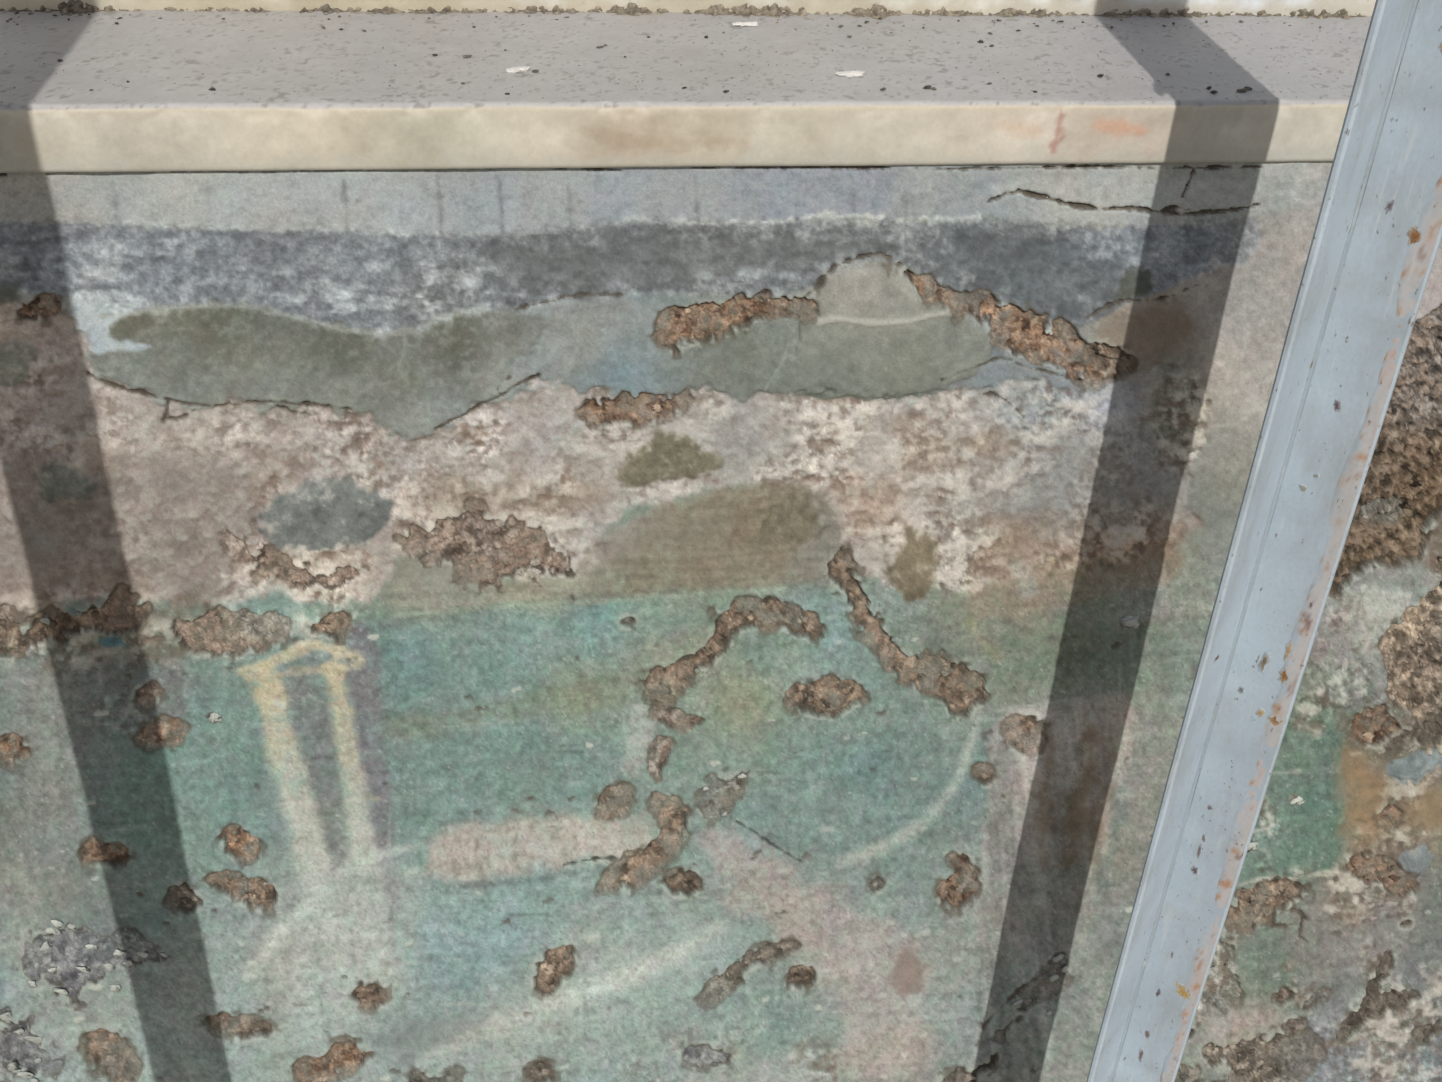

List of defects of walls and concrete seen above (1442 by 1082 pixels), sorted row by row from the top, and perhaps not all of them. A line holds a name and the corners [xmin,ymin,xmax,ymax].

crack [45,169,82,177]
crack [153,167,445,175]
crack [487,166,622,174]
crack [692,164,1263,218]
flaking render [0,255,1209,725]
spalling [1328,302,1442,787]
spalling [590,593,829,902]
spalling [161,821,280,919]
peeling [0,1005,145,1082]
spalling [693,932,825,1012]
spalling [1200,867,1316,1015]
spalling [1174,950,1442,1082]